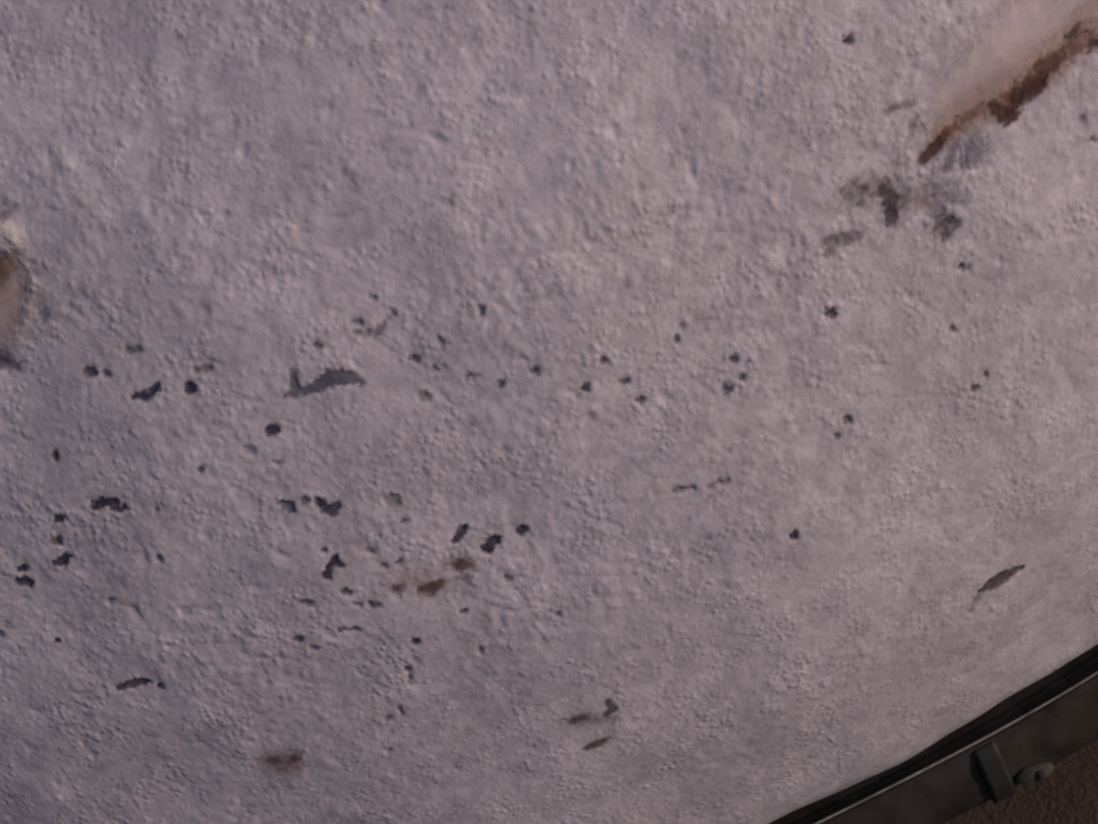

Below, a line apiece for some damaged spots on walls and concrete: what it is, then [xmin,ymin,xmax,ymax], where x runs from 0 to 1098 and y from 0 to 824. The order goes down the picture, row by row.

peeling [131,382,161,402]
peeling [284,368,363,398]
peeling [91,497,127,512]
peeling [277,496,340,517]
peeling [451,524,467,544]
peeling [480,536,500,553]
peeling [322,548,344,579]
spalling [978,565,1024,592]
peeling [116,678,164,690]